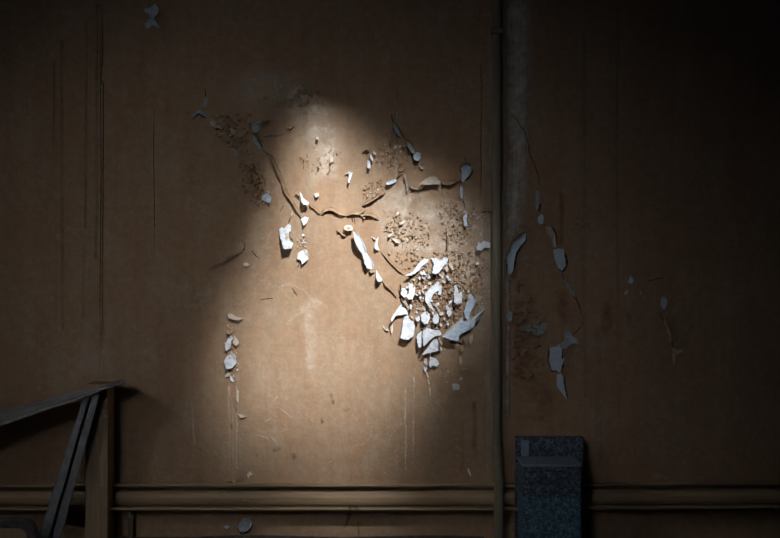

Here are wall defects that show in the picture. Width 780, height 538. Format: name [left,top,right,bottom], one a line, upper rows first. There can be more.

peeling [223,313,247,418]
peeling [279,218,310,268]
crack [262,150,405,275]
peeling [337,225,491,396]
peeling [386,116,473,226]
peeling [506,225,530,275]
peeling [535,190,583,399]